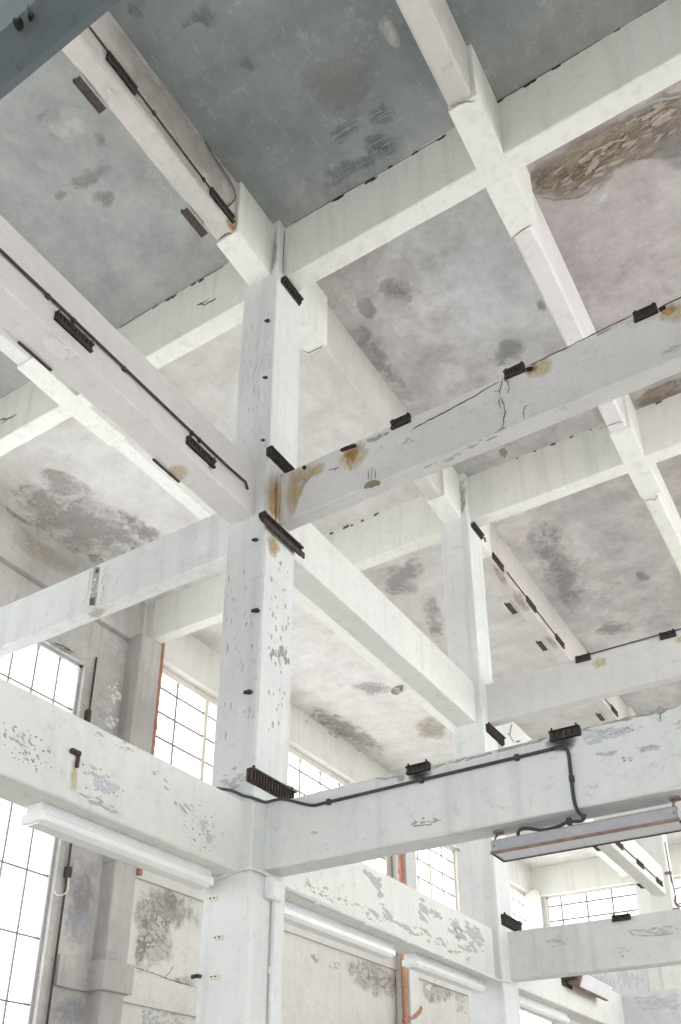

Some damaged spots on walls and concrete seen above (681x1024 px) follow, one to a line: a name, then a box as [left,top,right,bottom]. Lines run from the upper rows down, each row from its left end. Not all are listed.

rust [658,306,681,317]
crack [413,315,632,431]
rust [525,362,546,373]
rust [340,444,363,468]
leakage [13,470,156,559]
rust [269,465,322,520]
peeling [3,723,52,773]
leakage [305,710,374,752]
peeling [79,761,124,814]
peeling [136,898,174,962]
peeling [305,868,485,961]
peeling [310,954,396,996]